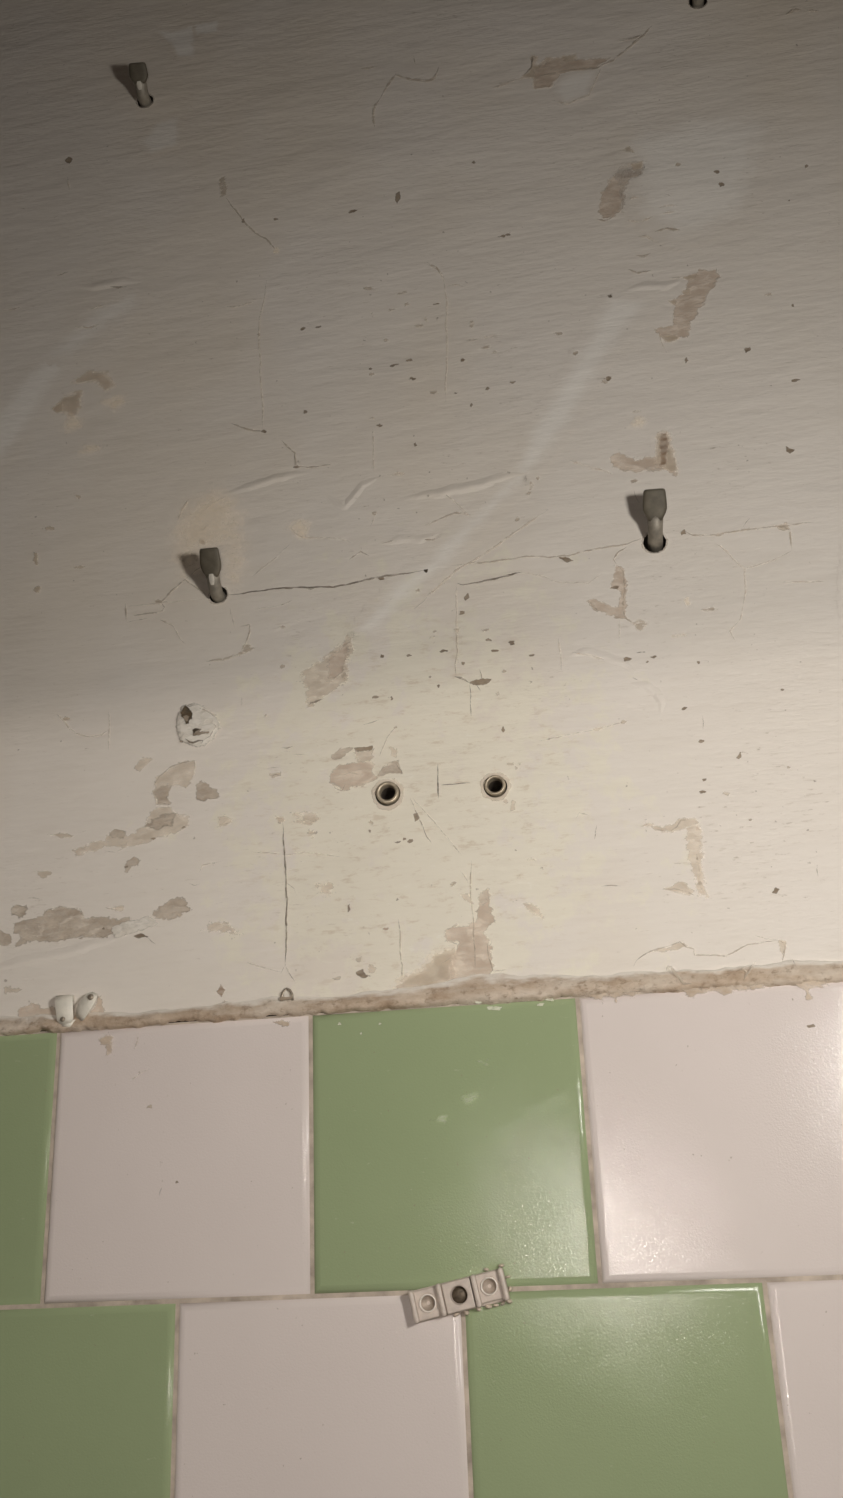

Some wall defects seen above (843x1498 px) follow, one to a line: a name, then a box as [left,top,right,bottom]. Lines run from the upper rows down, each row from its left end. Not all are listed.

peeling [524,30,648,105]
peeling [598,147,644,221]
peeling [656,269,720,342]
crack [681,522,806,543]
crack [125,512,629,630]
peeling [302,634,354,707]
peeling [73,703,221,873]
peeling [330,746,427,843]
peeling [643,818,709,897]
peeling [0,897,190,947]
crack [283,828,294,980]